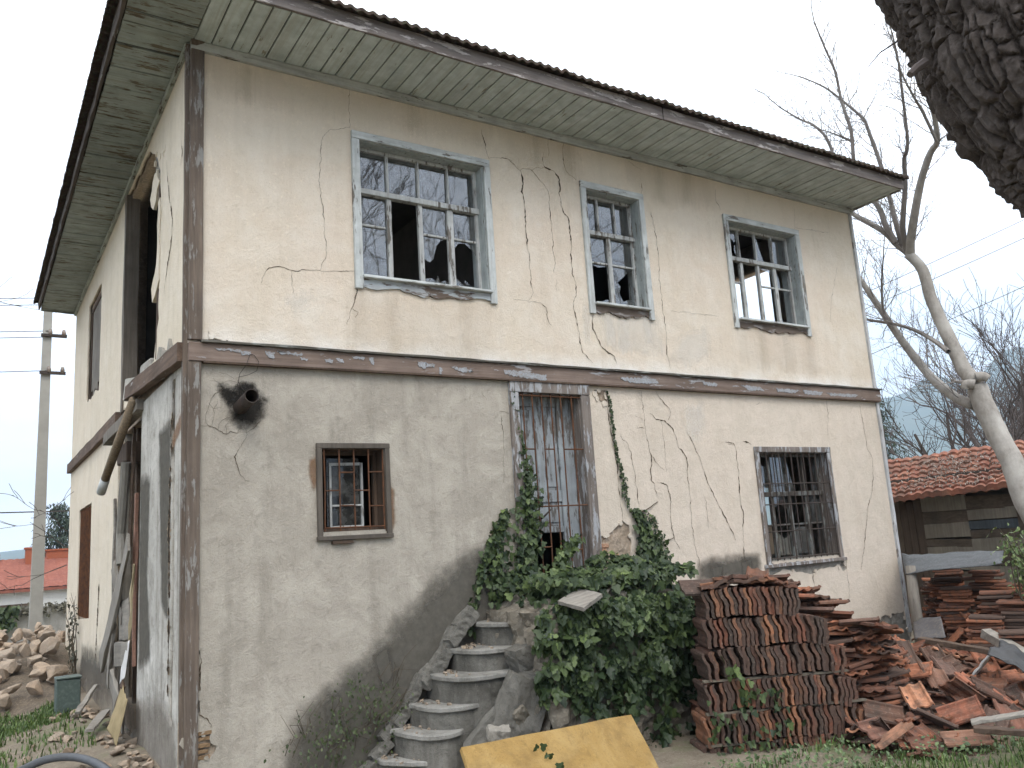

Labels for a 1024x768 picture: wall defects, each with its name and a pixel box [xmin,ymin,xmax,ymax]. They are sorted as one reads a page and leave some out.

crack [261,90,358,322]
crack [481,132,617,363]
peeling [208,332,251,355]
peeling [325,356,374,365]
peeling [418,362,473,374]
peeling [504,370,547,381]
leakage [222,382,257,404]
peeling [741,385,857,397]
crack [205,373,262,481]
crack [599,390,749,565]
spalling [601,521,632,562]
spalling [198,730,219,760]